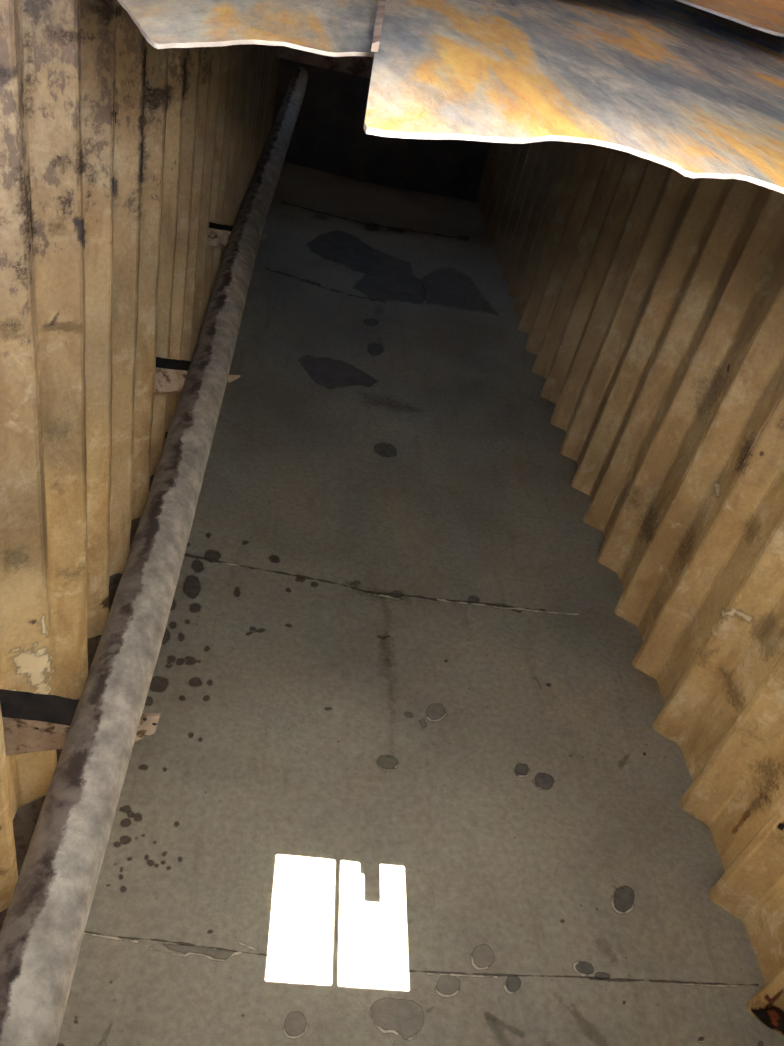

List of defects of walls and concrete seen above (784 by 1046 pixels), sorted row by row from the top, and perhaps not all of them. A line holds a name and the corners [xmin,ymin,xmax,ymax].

water stain [307,231,495,314]
water stain [299,356,377,389]
crack [184,553,580,616]
peeling [11,615,54,695]
crack [84,931,271,961]
crack [409,970,759,988]